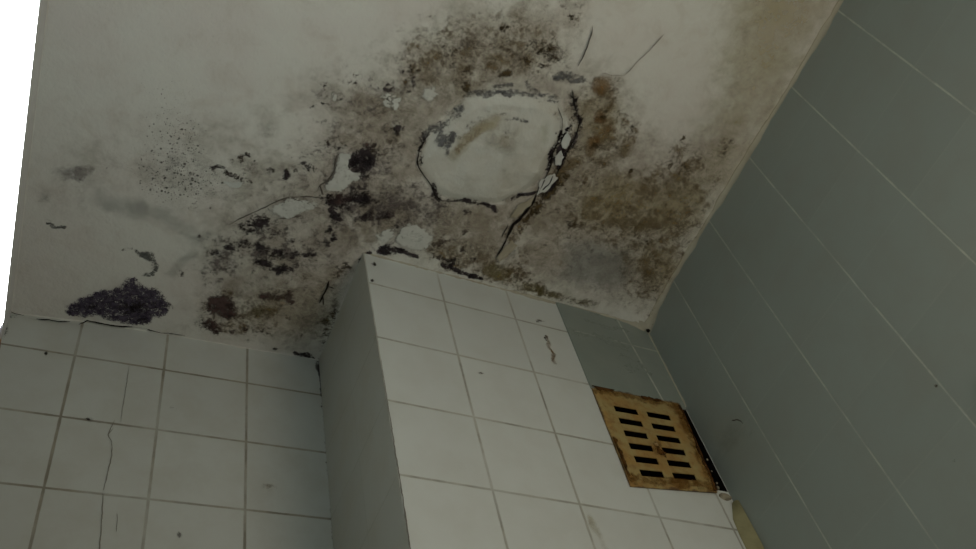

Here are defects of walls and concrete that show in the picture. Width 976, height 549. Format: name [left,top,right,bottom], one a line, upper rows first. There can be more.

crack [604,38,661,76]
water stain [65,249,171,325]
water stain [131,94,255,211]
crack [231,153,338,224]
peeling [325,153,362,193]
peeling [375,223,435,250]
water stain [202,17,709,334]
crack [497,91,580,256]
water stain [293,305,336,407]
crack [99,370,129,549]
corrosion [592,385,717,491]